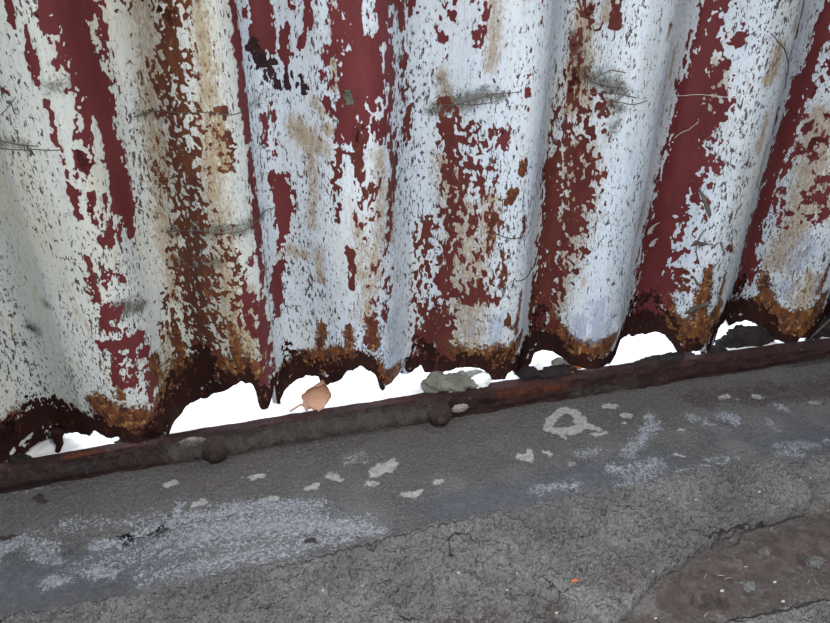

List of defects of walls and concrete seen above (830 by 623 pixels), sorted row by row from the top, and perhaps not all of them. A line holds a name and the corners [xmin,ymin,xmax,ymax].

peeling [4,0,42,87]
peeling [34,0,136,249]
peeling [83,254,155,404]
peeling [227,0,421,386]
corrosion [0,0,830,464]
peeling [408,95,519,362]
peeling [471,0,492,49]
peeling [528,0,623,336]
peeling [629,0,749,315]
peeling [734,0,830,297]
crack [703,514,805,548]
crack [713,599,830,623]